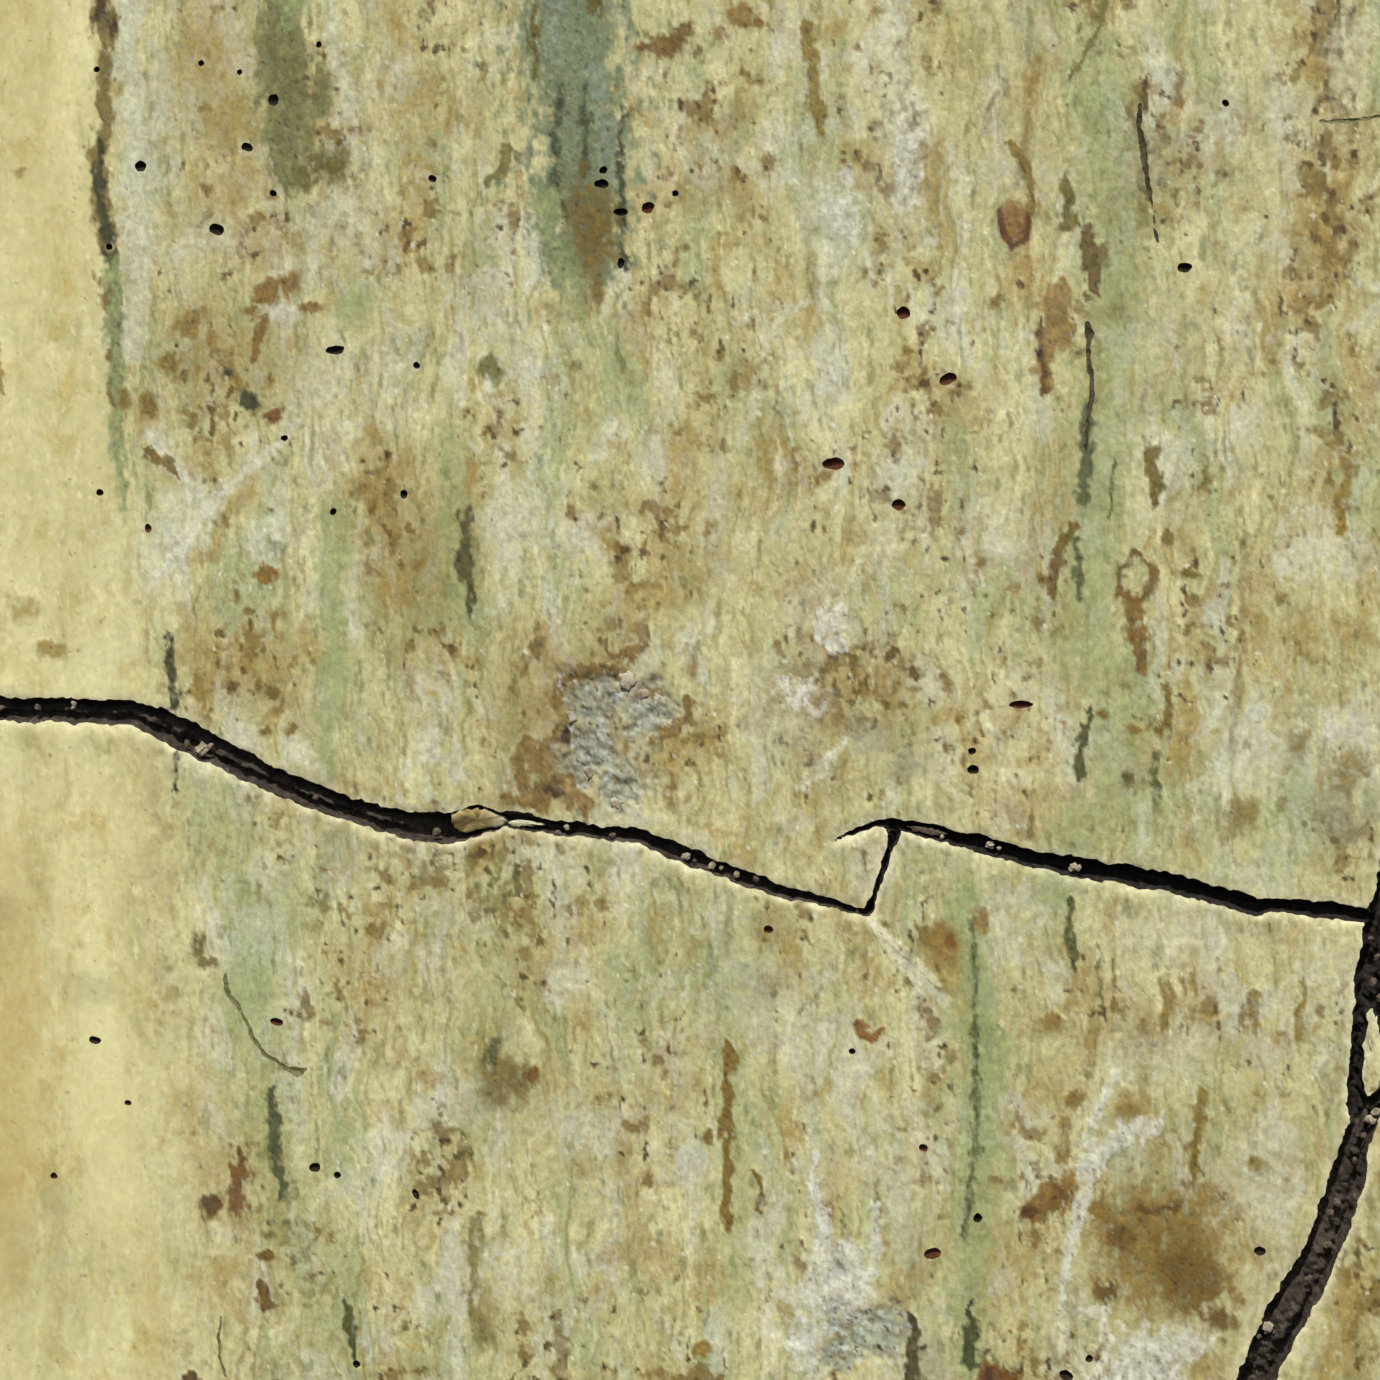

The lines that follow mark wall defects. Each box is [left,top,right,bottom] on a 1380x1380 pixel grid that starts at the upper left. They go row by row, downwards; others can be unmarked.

water stain [522,0,632,331]
corrosion [992,137,1040,259]
flaking render [552,649,694,827]
crack [0,695,1380,1380]